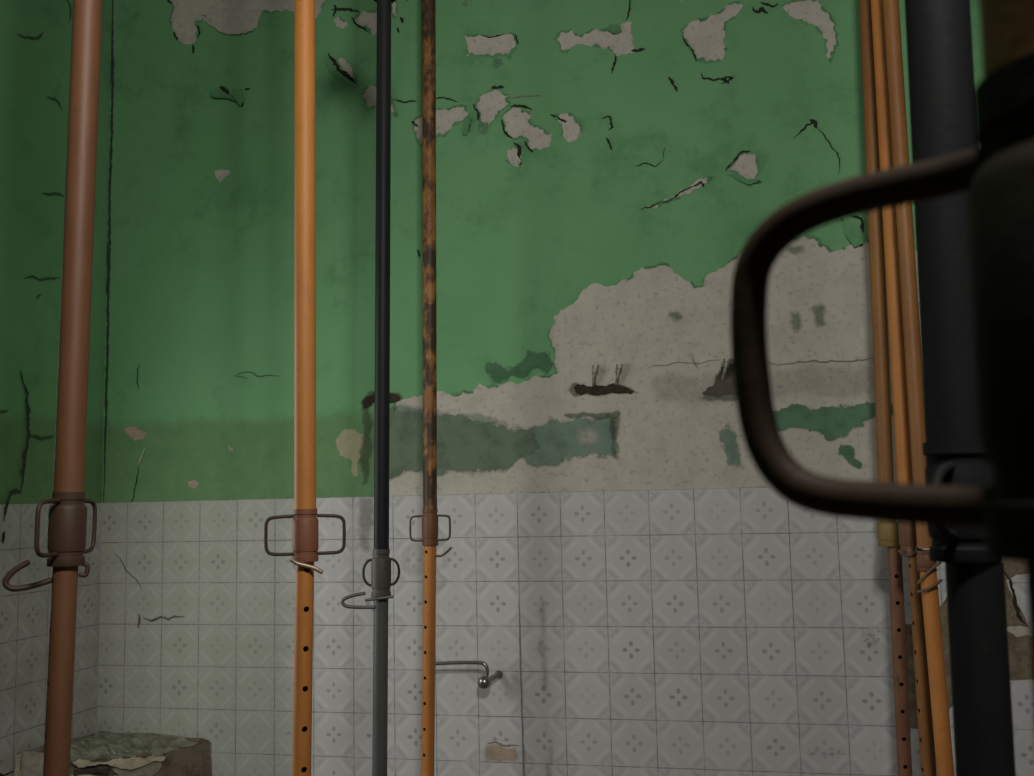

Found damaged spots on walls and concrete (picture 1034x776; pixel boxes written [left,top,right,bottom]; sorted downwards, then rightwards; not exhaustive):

peeling [164,0,294,53]
peeling [553,0,645,72]
peeling [679,1,743,64]
peeling [436,85,582,167]
crack [795,119,840,174]
crack [640,181,704,210]
peeling [437,255,770,495]
peeling [767,235,878,482]
crack [0,371,54,544]
peeling [336,429,365,476]
peeling [389,470,423,496]
crack [517,601,525,776]